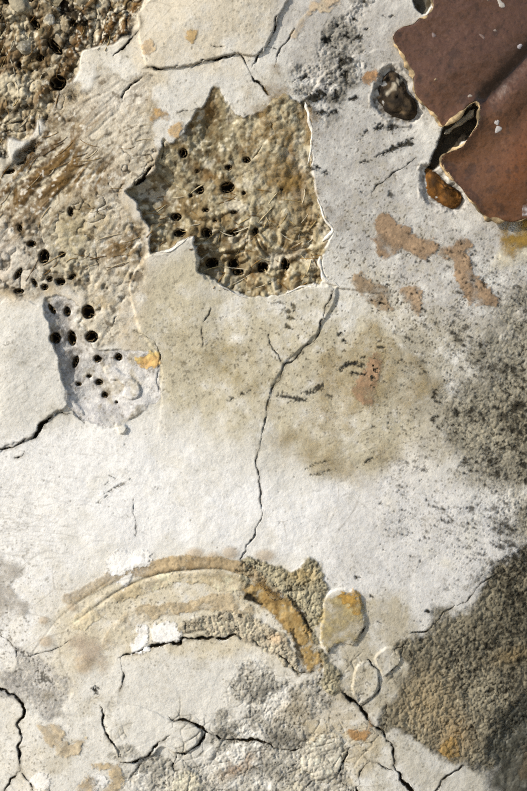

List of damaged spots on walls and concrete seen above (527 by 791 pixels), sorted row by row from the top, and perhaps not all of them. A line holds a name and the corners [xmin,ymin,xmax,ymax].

leakage [301,82,341,119]
leakage [322,36,352,86]
spalling [322,17,362,118]
corrosion [425,168,462,209]
spalling [0,66,339,429]
leakage [398,245,527,791]
peeling [105,549,152,591]
crack [0,688,50,791]
crack [101,707,298,779]
crack [121,633,311,686]
spalling [108,556,353,791]
crack [338,598,470,791]